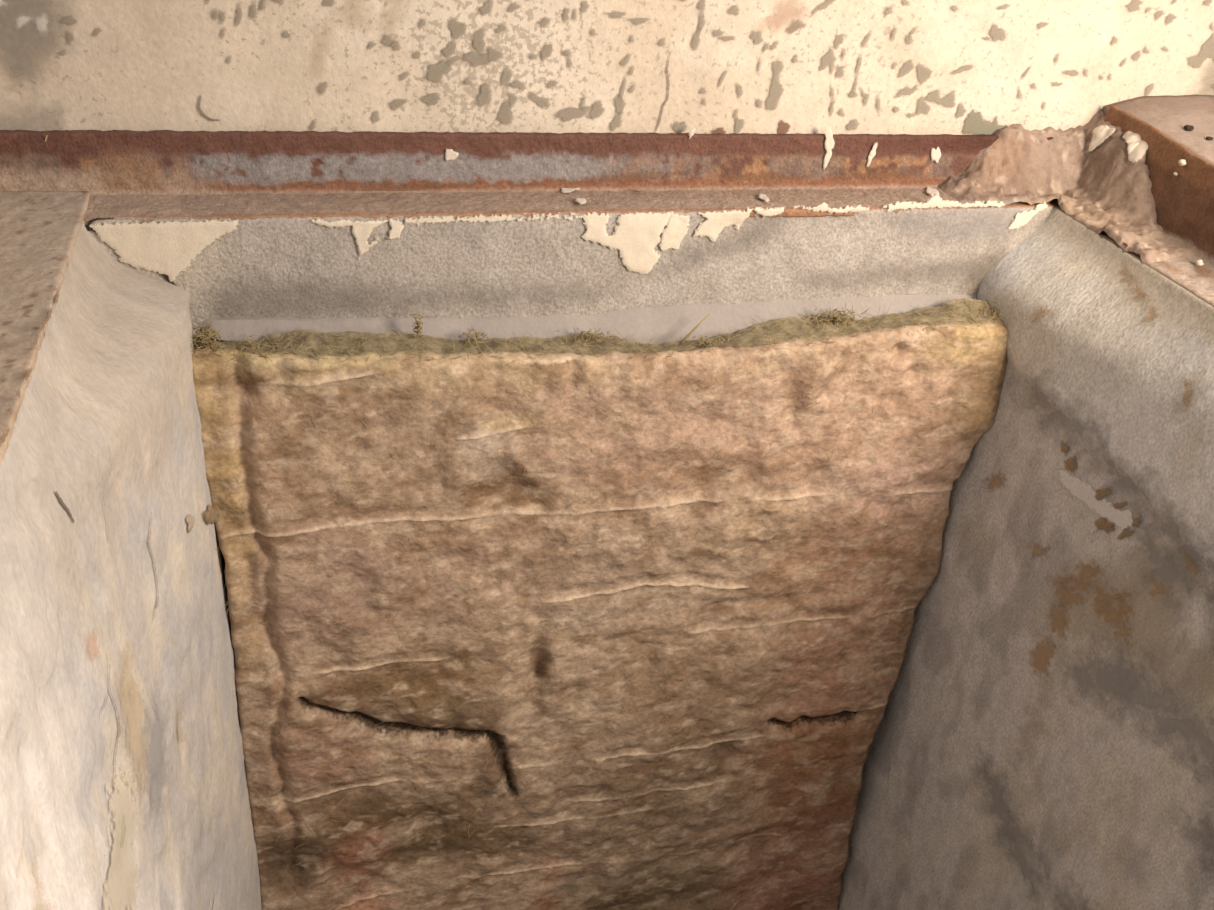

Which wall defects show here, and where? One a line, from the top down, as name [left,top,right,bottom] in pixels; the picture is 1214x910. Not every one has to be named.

peeling [311,194,1048,274]
rust [1030,563,1130,672]